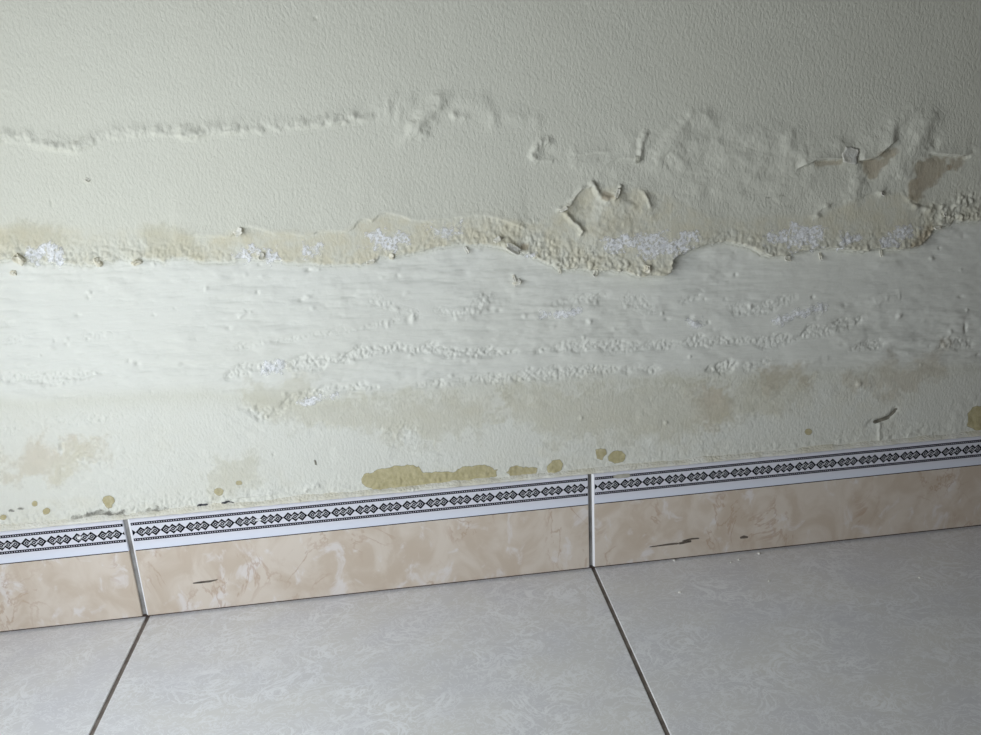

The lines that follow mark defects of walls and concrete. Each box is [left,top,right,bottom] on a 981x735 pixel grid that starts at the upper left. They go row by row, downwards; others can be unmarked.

spalling [934,177,981,231]
water stain [25,242,64,266]
peeling [0,200,534,267]
water stain [365,228,410,254]
water stain [603,230,699,261]
water stain [767,221,824,253]
water stain [967,406,981,430]
water stain [596,449,626,463]
water stain [362,460,563,490]